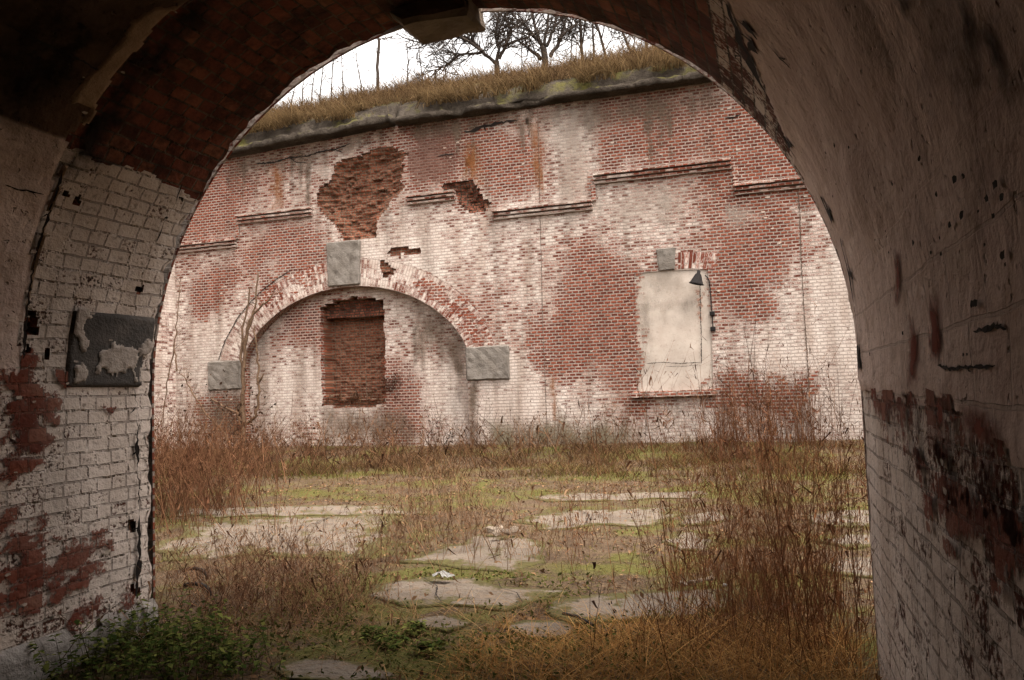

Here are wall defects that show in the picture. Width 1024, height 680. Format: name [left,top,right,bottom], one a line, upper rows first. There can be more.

peeling [0,165,154,486]
spalling [185,117,548,355]
crack [437,107,548,444]
peeling [525,239,654,421]
peeling [0,503,146,634]
crack [131,390,142,598]
peeling [868,388,1024,596]